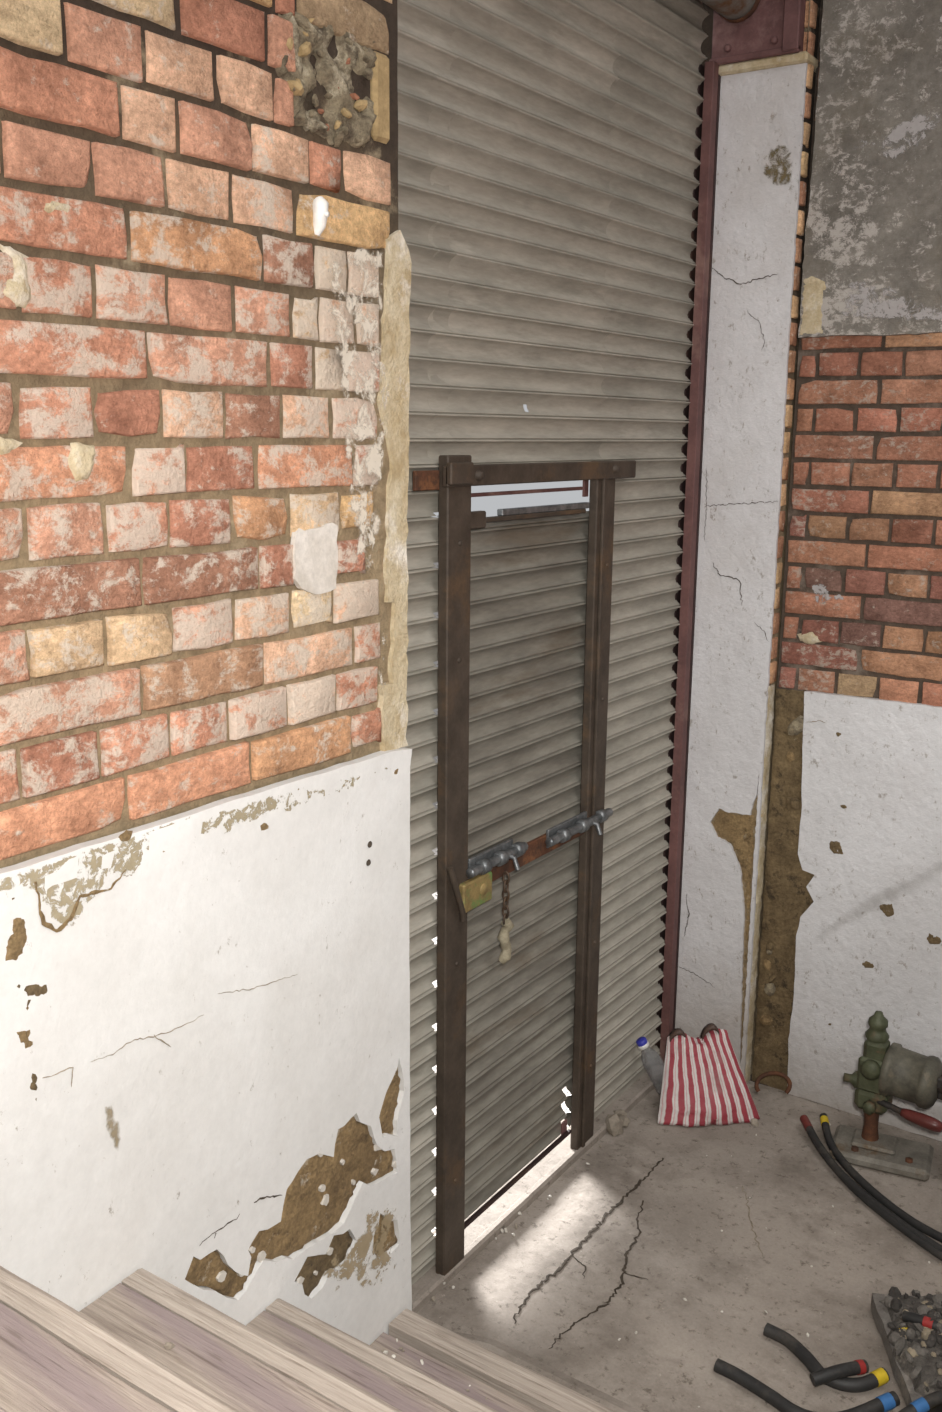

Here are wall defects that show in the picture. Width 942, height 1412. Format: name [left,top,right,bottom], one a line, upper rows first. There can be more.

spalling [275,12,390,148]
peeling [0,768,398,961]
flaking render [713,684,814,1091]
peeling [17,1030,33,1048]
peeling [17,984,47,1010]
spalling [185,1067,400,1297]
crack [513,1158,664,1349]